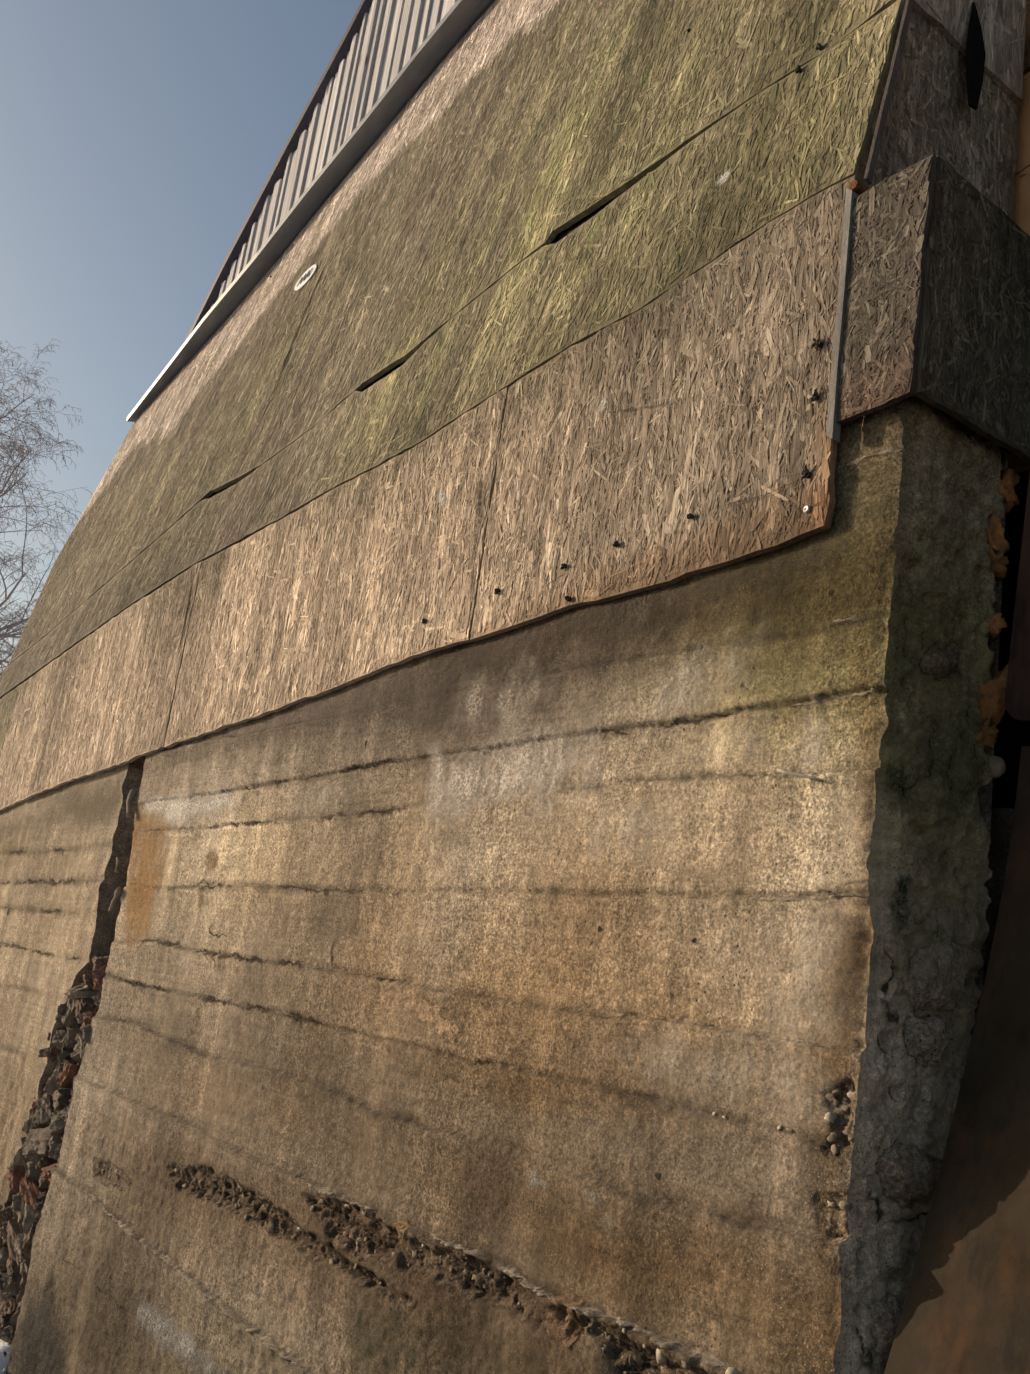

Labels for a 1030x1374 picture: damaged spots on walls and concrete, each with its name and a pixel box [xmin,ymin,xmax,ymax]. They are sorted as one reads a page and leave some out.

corrosion [126,812,165,948]
spalling [821,1083,855,1162]
spalling [92,1157,130,1191]
spalling [817,1189,853,1245]
spalling [166,1162,708,1374]